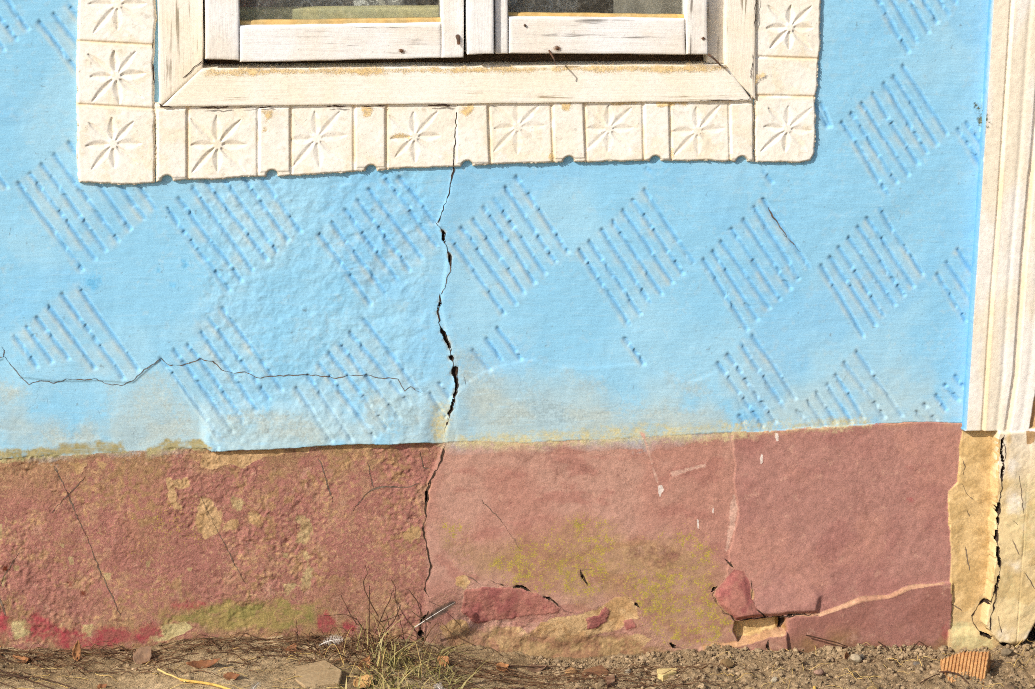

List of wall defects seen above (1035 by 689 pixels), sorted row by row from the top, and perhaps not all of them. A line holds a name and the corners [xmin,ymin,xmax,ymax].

crack [200,103,273,111]
crack [0,349,421,393]
crack [353,104,466,641]
peeling [164,474,264,542]
peeling [278,511,317,598]
spalling [701,434,1002,650]
crack [952,437,1035,647]
peeling [438,574,681,658]